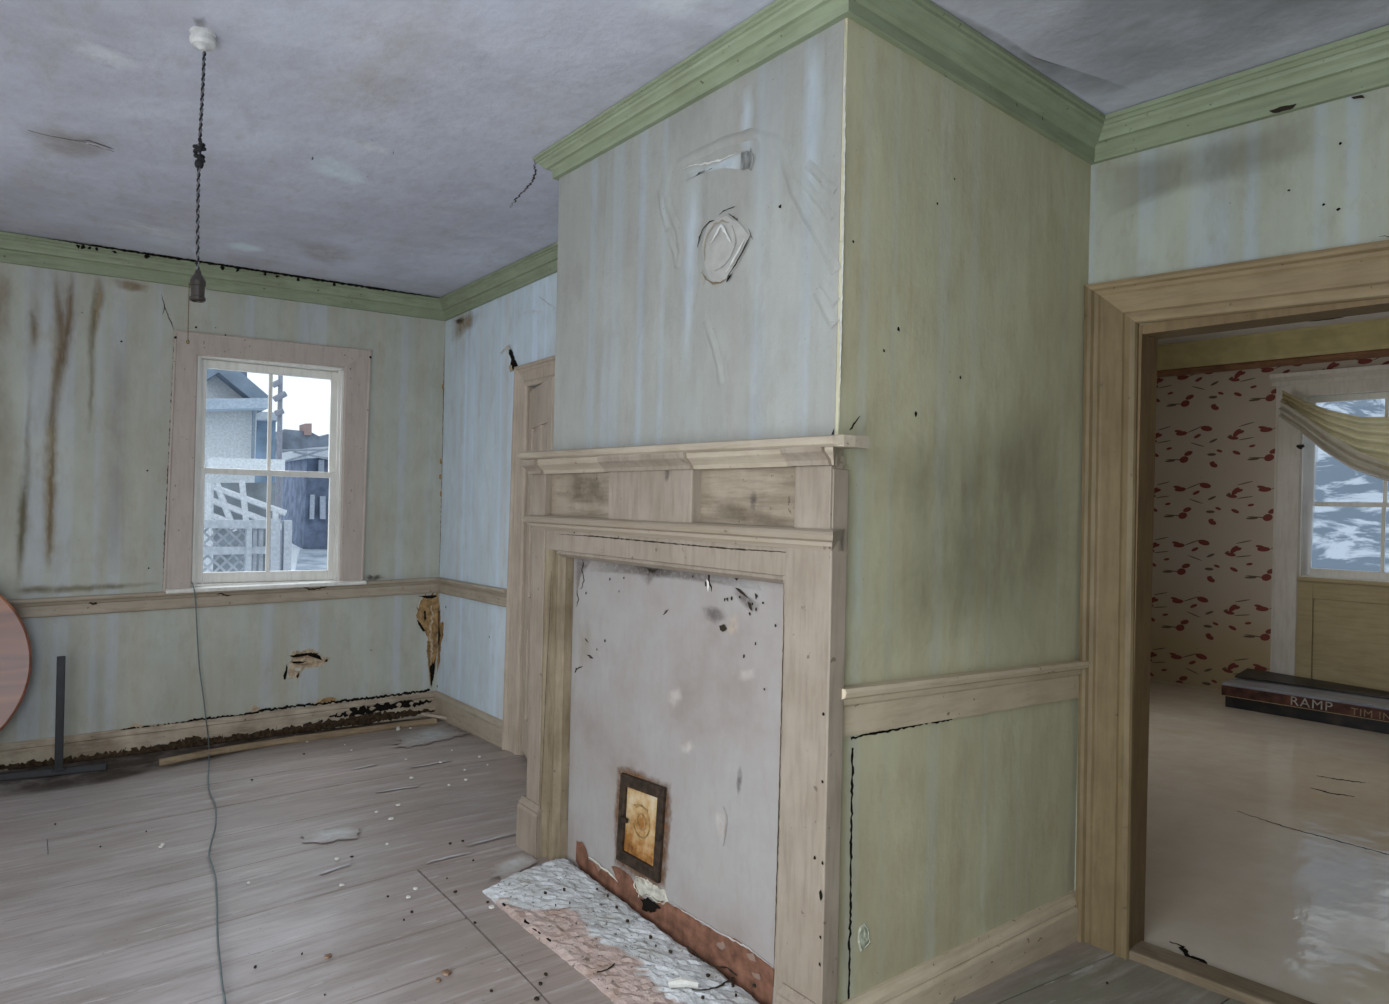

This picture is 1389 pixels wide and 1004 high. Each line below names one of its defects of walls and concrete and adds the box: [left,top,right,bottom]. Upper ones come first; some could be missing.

crack [510,161,537,208]
spalling [283,648,331,680]
spalling [416,593,446,687]
peeling [576,840,774,1004]